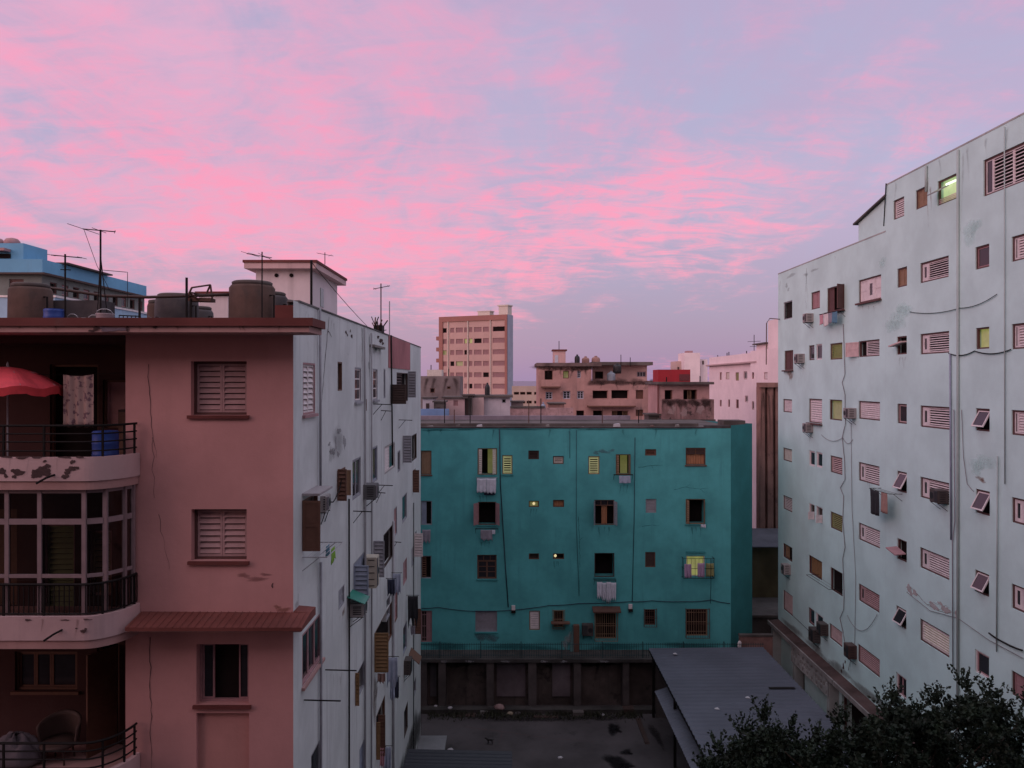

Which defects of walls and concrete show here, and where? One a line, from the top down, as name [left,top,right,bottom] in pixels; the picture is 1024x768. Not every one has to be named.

peeling [0,456,84,479]
crack [147,364,169,562]